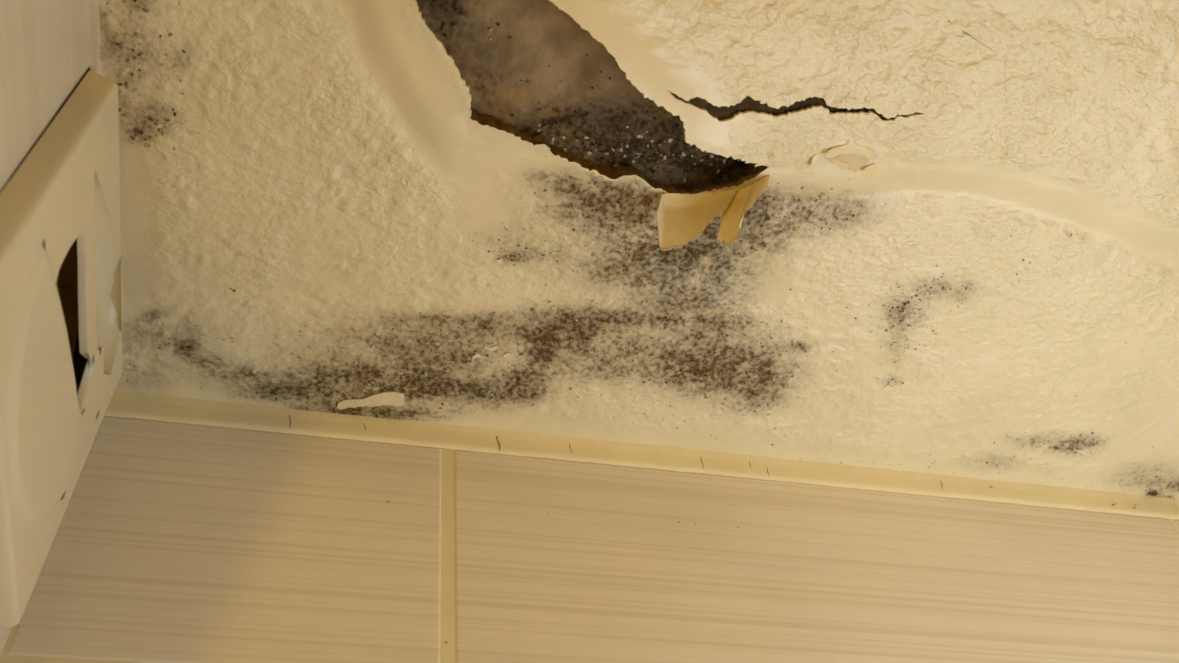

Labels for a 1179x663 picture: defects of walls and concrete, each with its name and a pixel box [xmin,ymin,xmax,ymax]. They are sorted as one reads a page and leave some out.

crack [669,91,918,120]
water stain [131,109,176,141]
spalling [416,0,770,250]
peeling [806,144,879,182]
mould [263,176,862,419]
mould [174,340,213,368]